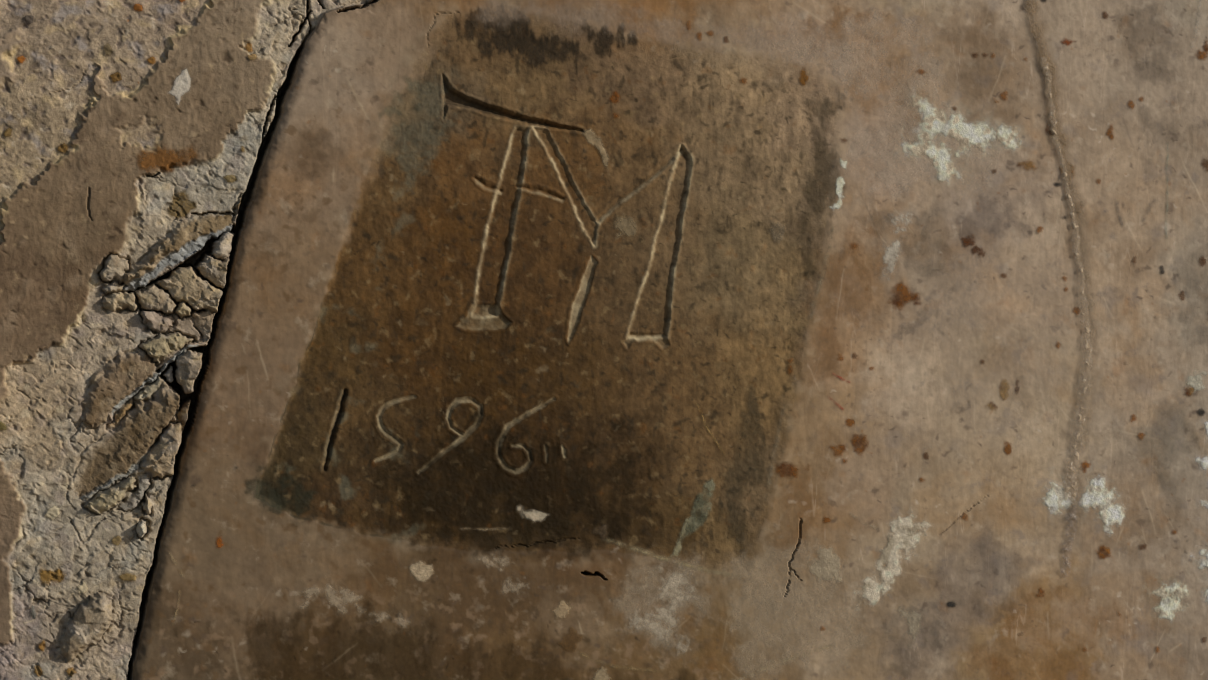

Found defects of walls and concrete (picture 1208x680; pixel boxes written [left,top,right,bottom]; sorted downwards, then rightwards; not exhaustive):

leakage [456,8,637,68]
leakage [902,98,1021,181]
corrosion [893,283,920,309]
leakage [1025,0,1125,533]
spalling [0,0,371,680]
crack [59,0,380,680]
crack [784,518,803,599]
leakage [854,515,930,605]
leakage [1153,583,1188,620]